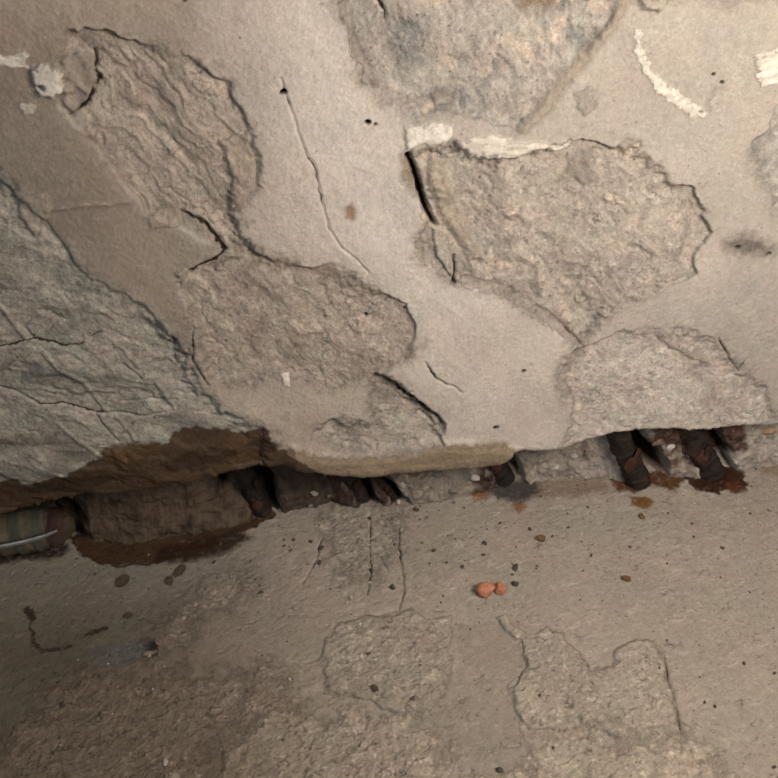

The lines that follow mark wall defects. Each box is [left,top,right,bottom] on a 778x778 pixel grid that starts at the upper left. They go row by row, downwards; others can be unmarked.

spalling [338,0,622,133]
crack [307,157,323,205]
crack [405,152,432,219]
spalling [752,105,778,210]
spalling [0,27,445,486]
crack [0,331,99,346]
spalling [407,138,775,490]
corrosion [654,427,683,450]
corrosion [706,425,748,452]
spalling [233,466,272,518]
spalling [338,476,400,504]
corrosion [649,467,748,495]